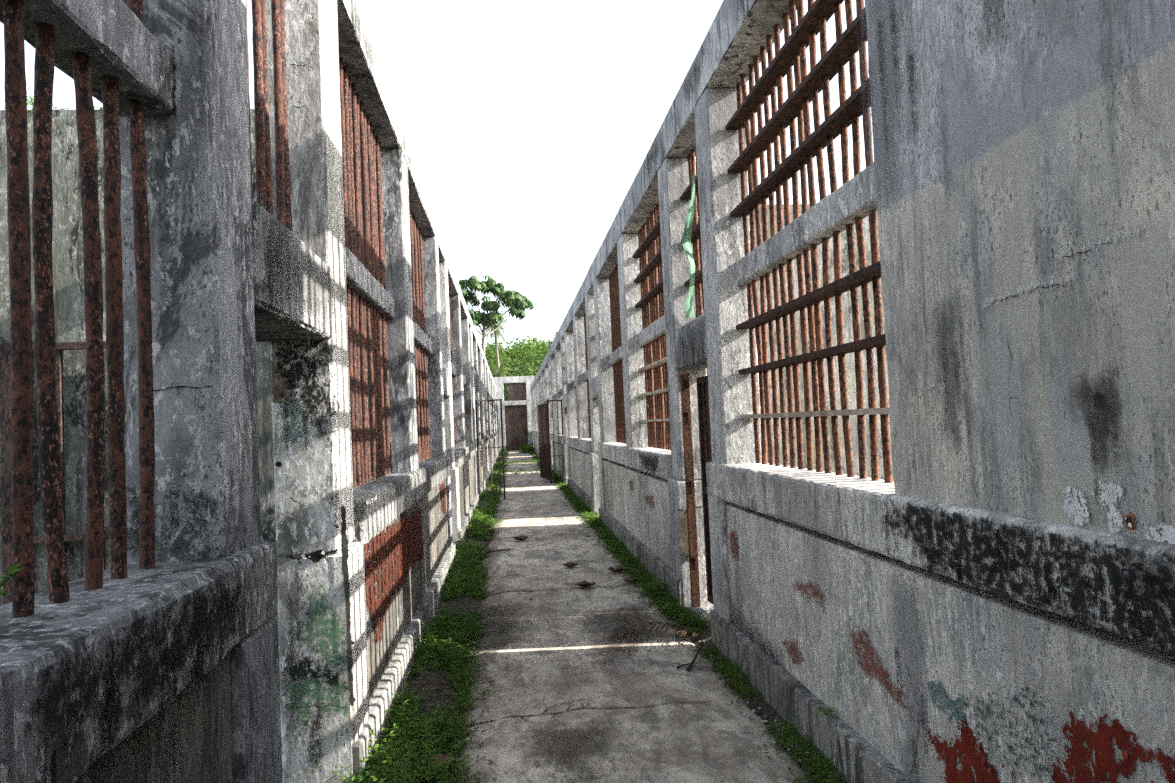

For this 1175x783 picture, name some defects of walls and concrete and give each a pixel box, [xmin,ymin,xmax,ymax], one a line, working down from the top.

water stain [265,226,342,457]
water stain [936,312,958,435]
crack [983,223,1139,377]
water stain [1076,378,1119,500]
mould [24,573,248,783]
crack [286,549,338,565]
peeling [286,506,356,730]
peeling [364,505,424,643]
peeling [850,625,907,709]
water stain [880,502,1175,657]
peeling [923,678,1175,783]
spalling [1062,479,1175,544]